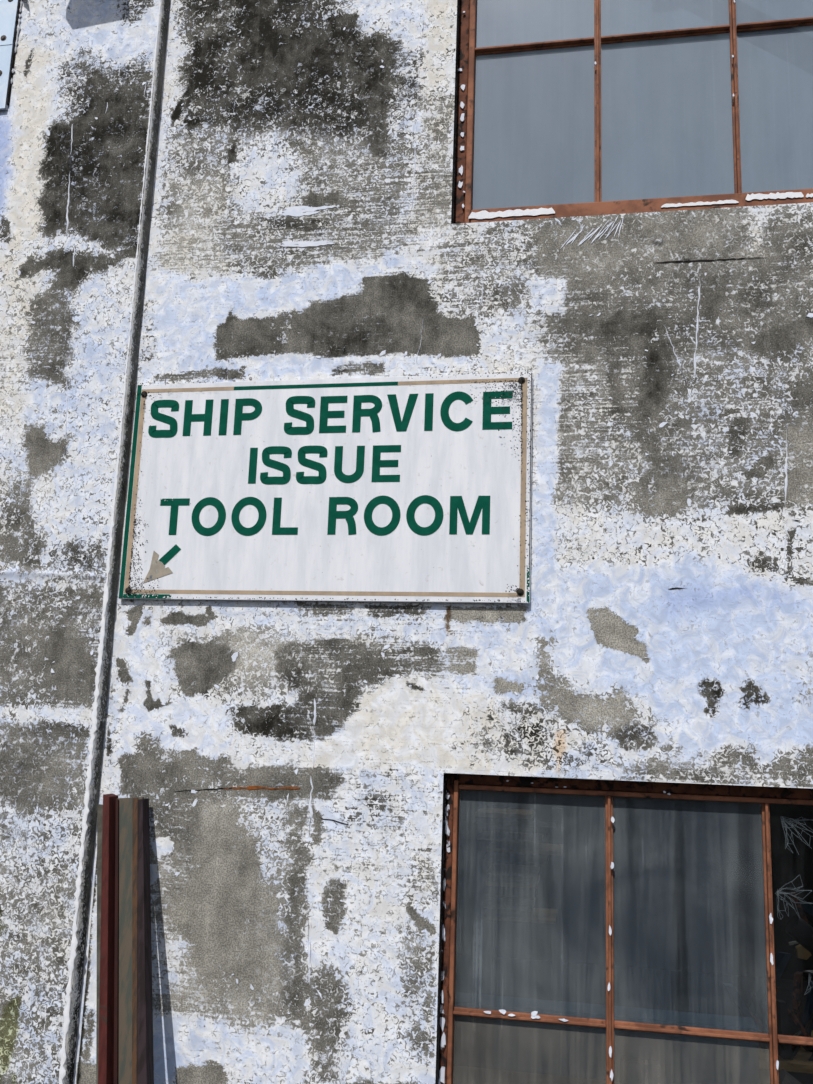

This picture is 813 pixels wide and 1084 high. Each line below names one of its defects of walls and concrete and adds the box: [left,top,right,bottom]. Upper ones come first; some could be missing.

peeling [168,0,433,167]
peeling [0,39,155,397]
peeling [249,188,341,237]
peeling [152,267,535,384]
damp [566,216,624,246]
peeling [546,301,702,525]
peeling [723,307,813,589]
peeling [0,417,110,818]
peeling [113,602,242,714]
peeling [292,601,433,621]
peeling [445,603,813,852]
peeling [105,632,481,1084]